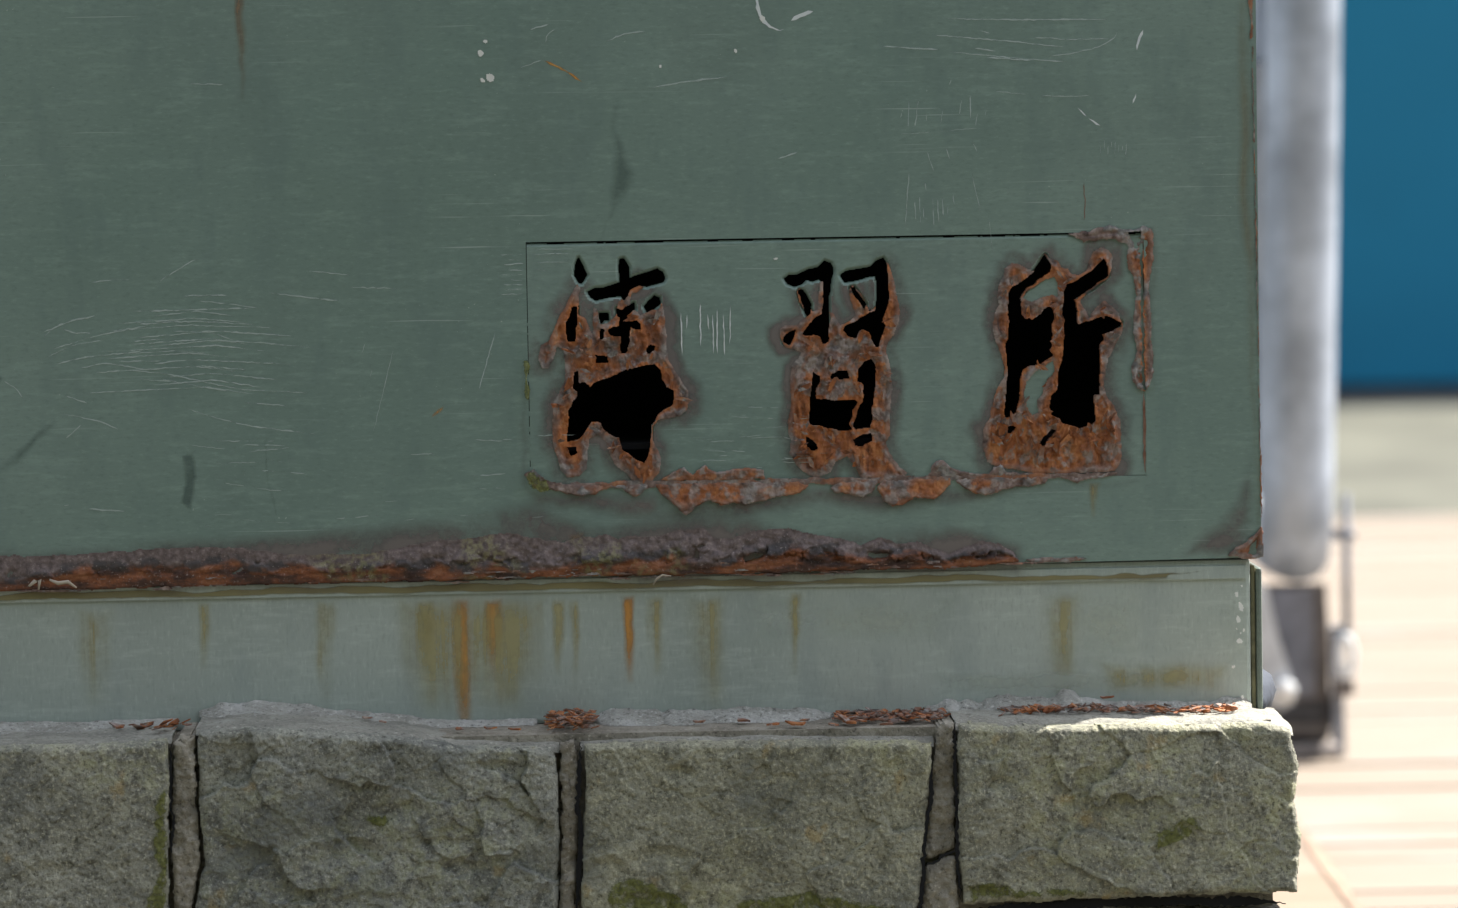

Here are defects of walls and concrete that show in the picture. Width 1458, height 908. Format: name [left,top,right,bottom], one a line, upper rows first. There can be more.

rust [554,272,698,452]
rust [769,279,875,425]
rust [820,461,888,506]
rust [0,527,1175,707]